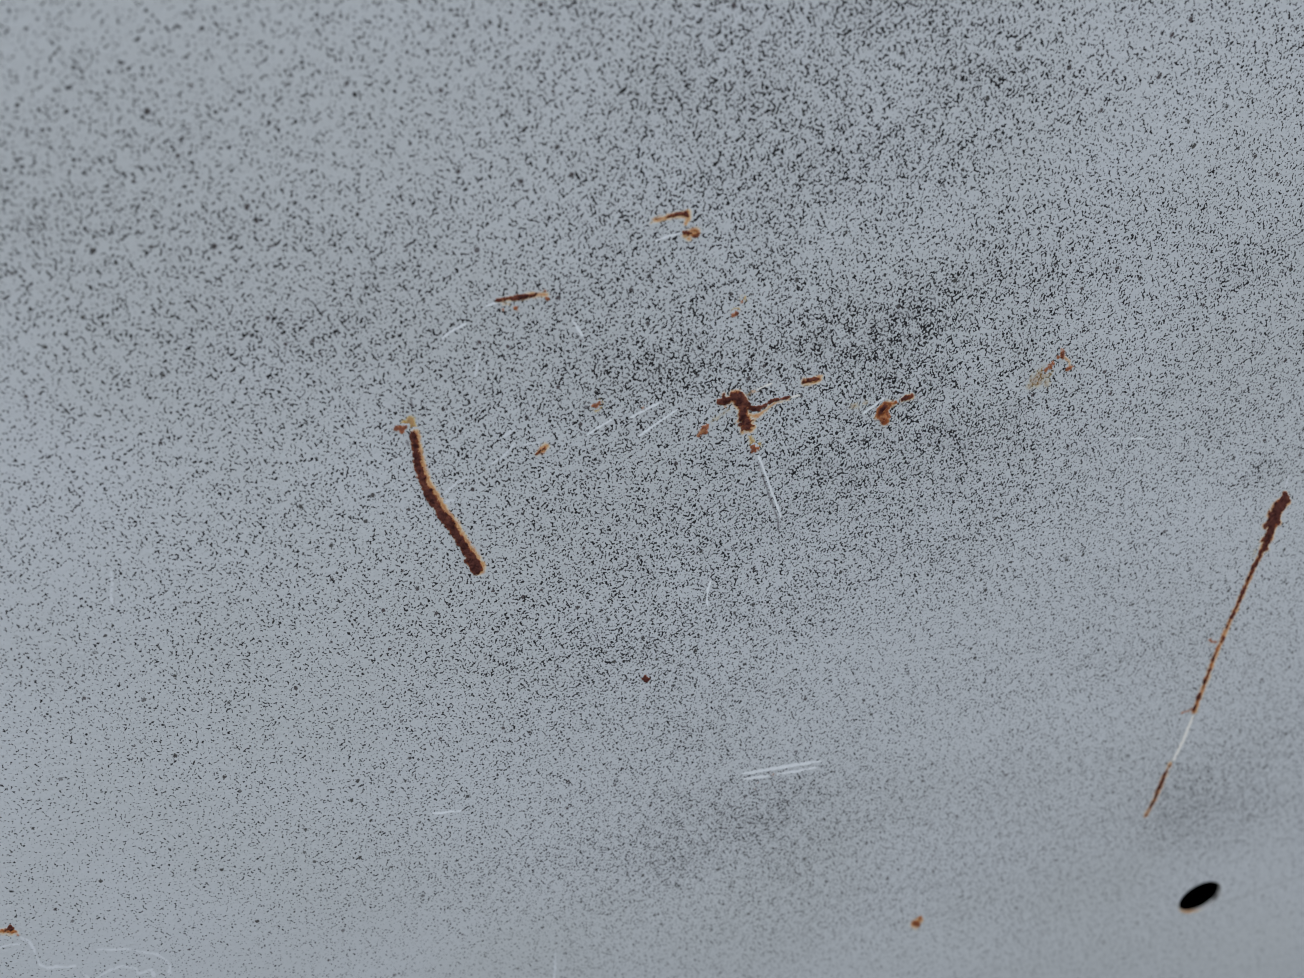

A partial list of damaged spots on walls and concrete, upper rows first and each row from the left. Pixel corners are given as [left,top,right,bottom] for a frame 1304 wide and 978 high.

rust [648,207,703,244]
rust [493,288,551,313]
rust [695,422,711,440]
rust [714,374,821,456]
rust [847,389,919,429]
rust [392,423,489,578]
rust [1190,489,1293,717]